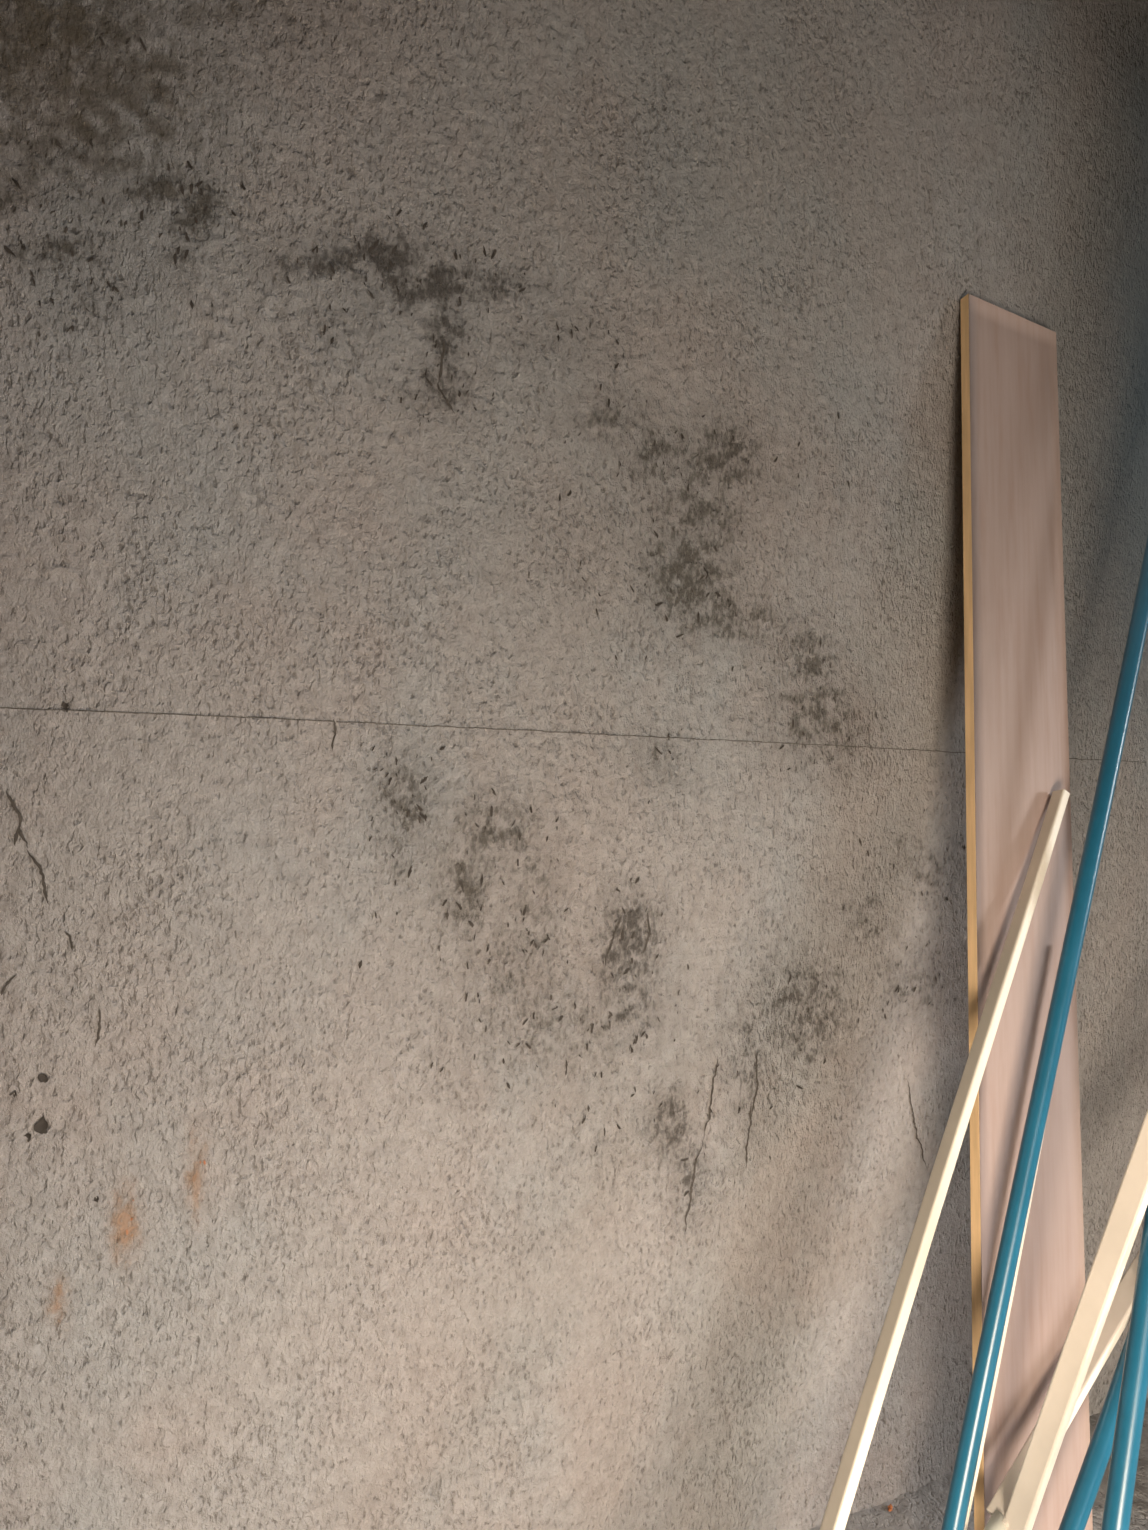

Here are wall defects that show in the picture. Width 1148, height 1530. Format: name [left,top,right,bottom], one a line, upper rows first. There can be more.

water stain [0,0,165,162]
water stain [4,226,120,300]
water stain [101,161,246,265]
water stain [269,208,526,426]
water stain [630,415,764,640]
water stain [760,616,850,772]
water stain [372,746,445,826]
crack [6,789,73,951]
water stain [442,788,550,980]
water stain [523,877,663,1075]
water stain [756,936,960,1064]
water stain [631,1087,706,1196]